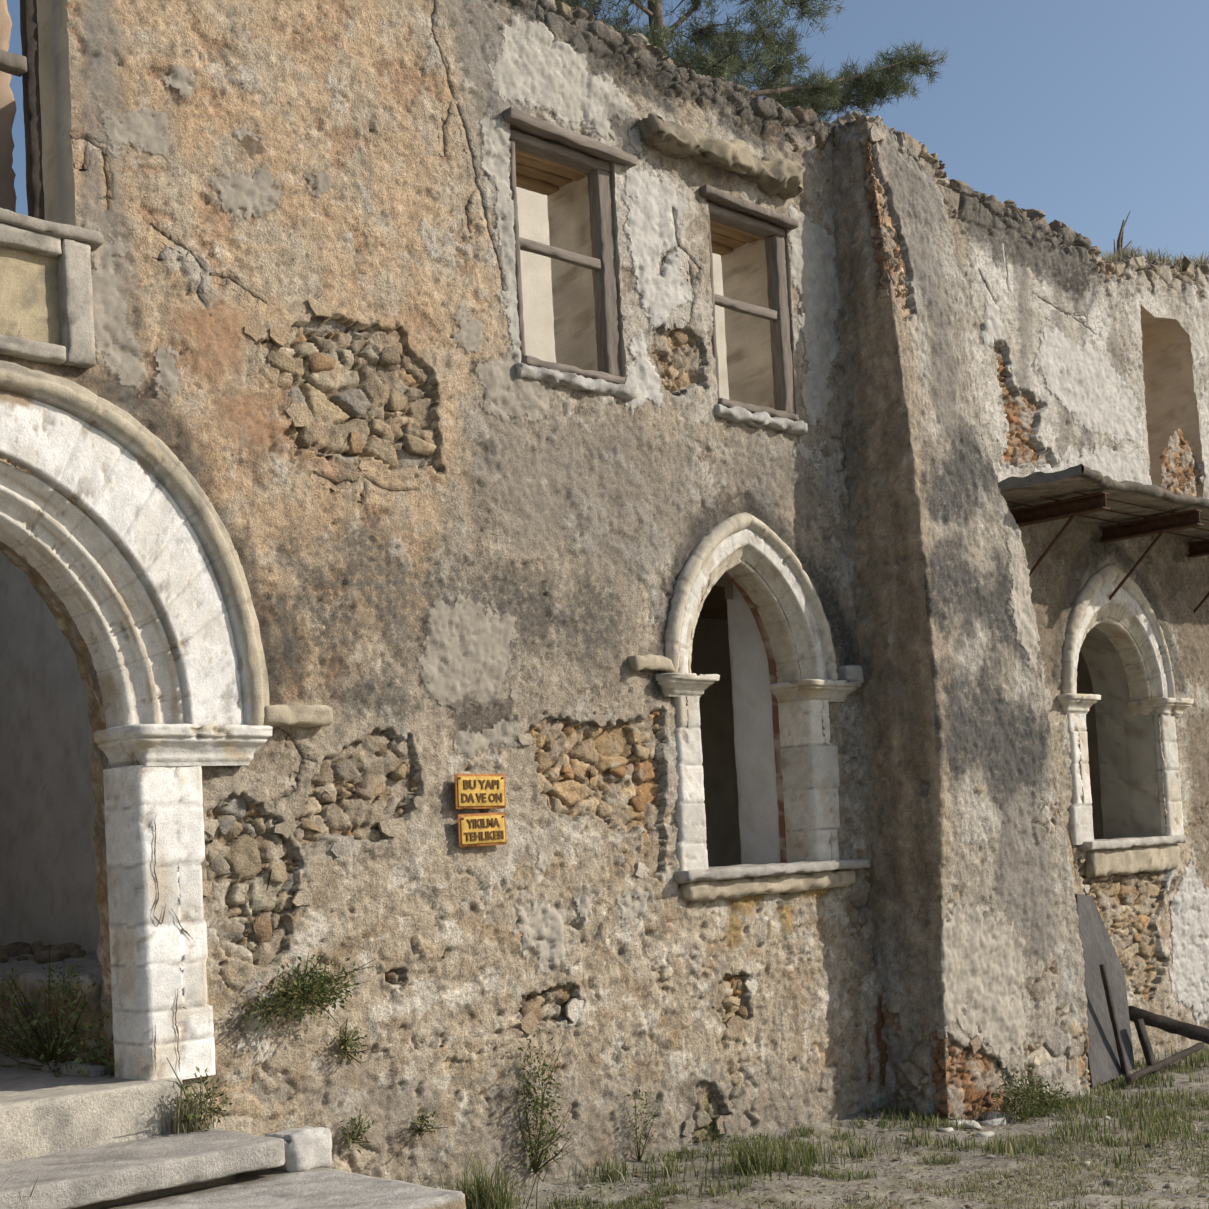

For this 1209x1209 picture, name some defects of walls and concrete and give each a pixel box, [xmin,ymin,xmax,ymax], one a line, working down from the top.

crack [426,0,515,344]
flaking render [488,8,705,414]
flaking render [243,294,439,473]
water stain [885,153,1209,693]
flaking render [982,293,1205,497]
crack [154,992,180,1072]
crack [153,816,193,939]
flaking render [202,730,426,967]
flaking render [416,587,673,927]
flaking render [930,901,1030,1120]
water stain [931,659,1058,955]
flaking render [1076,857,1209,1026]